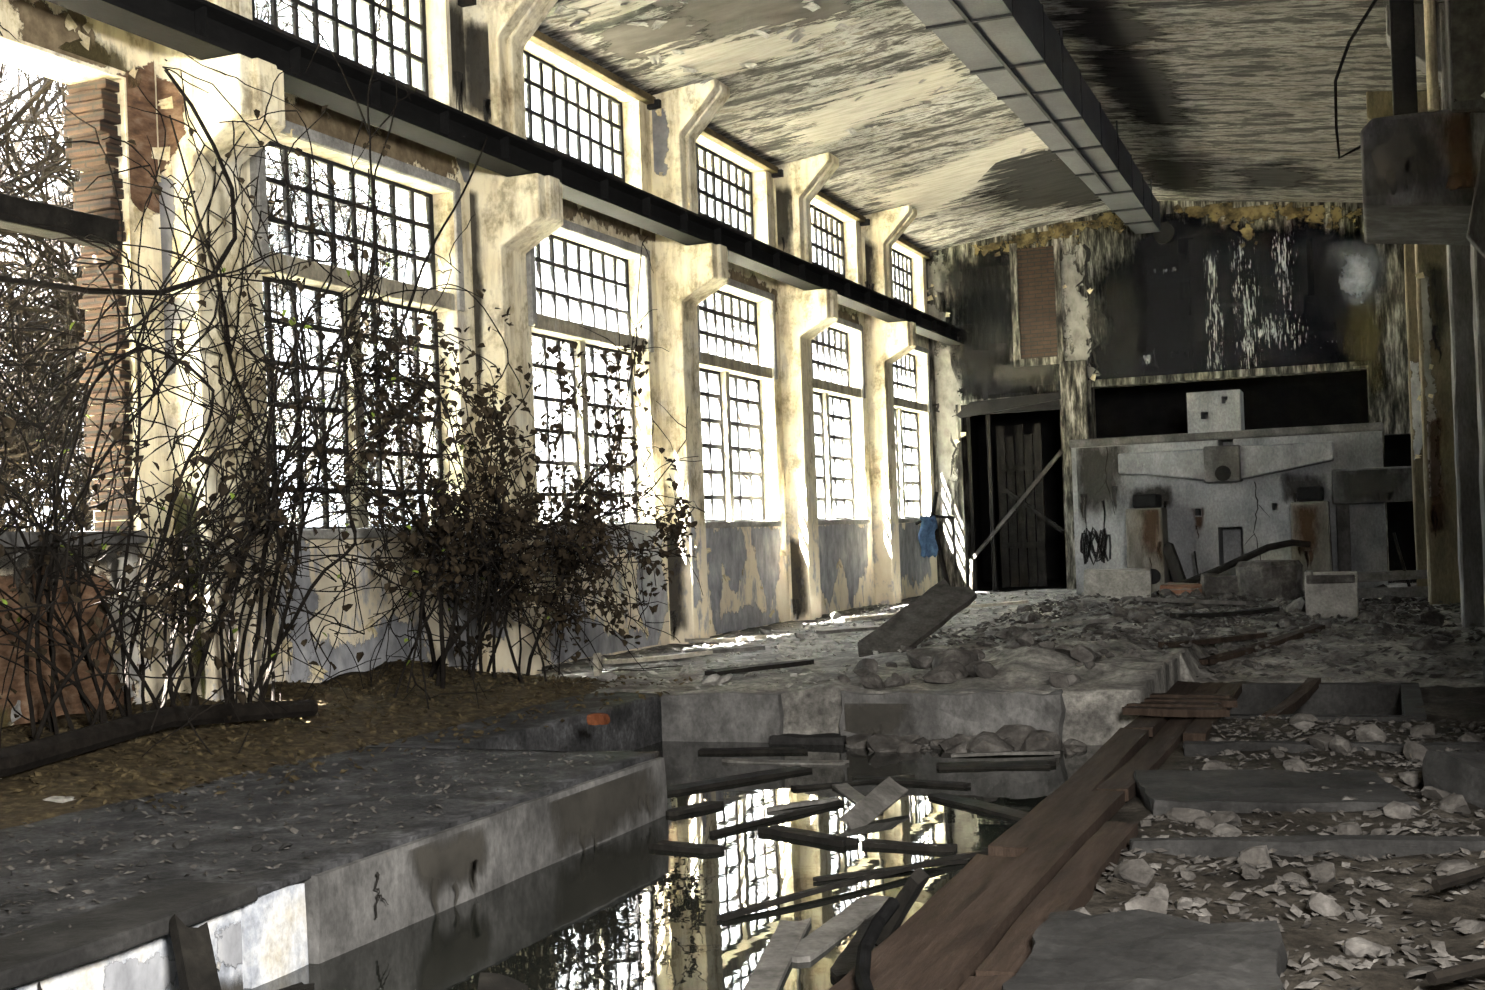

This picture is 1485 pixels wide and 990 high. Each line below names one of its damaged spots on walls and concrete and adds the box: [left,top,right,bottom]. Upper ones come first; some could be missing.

peeling [548,0,874,87]
peeling [652,108,669,176]
peeling [758,54,974,149]
peeling [865,125,1050,218]
peeling [563,198,655,244]
water stain [790,538,807,620]